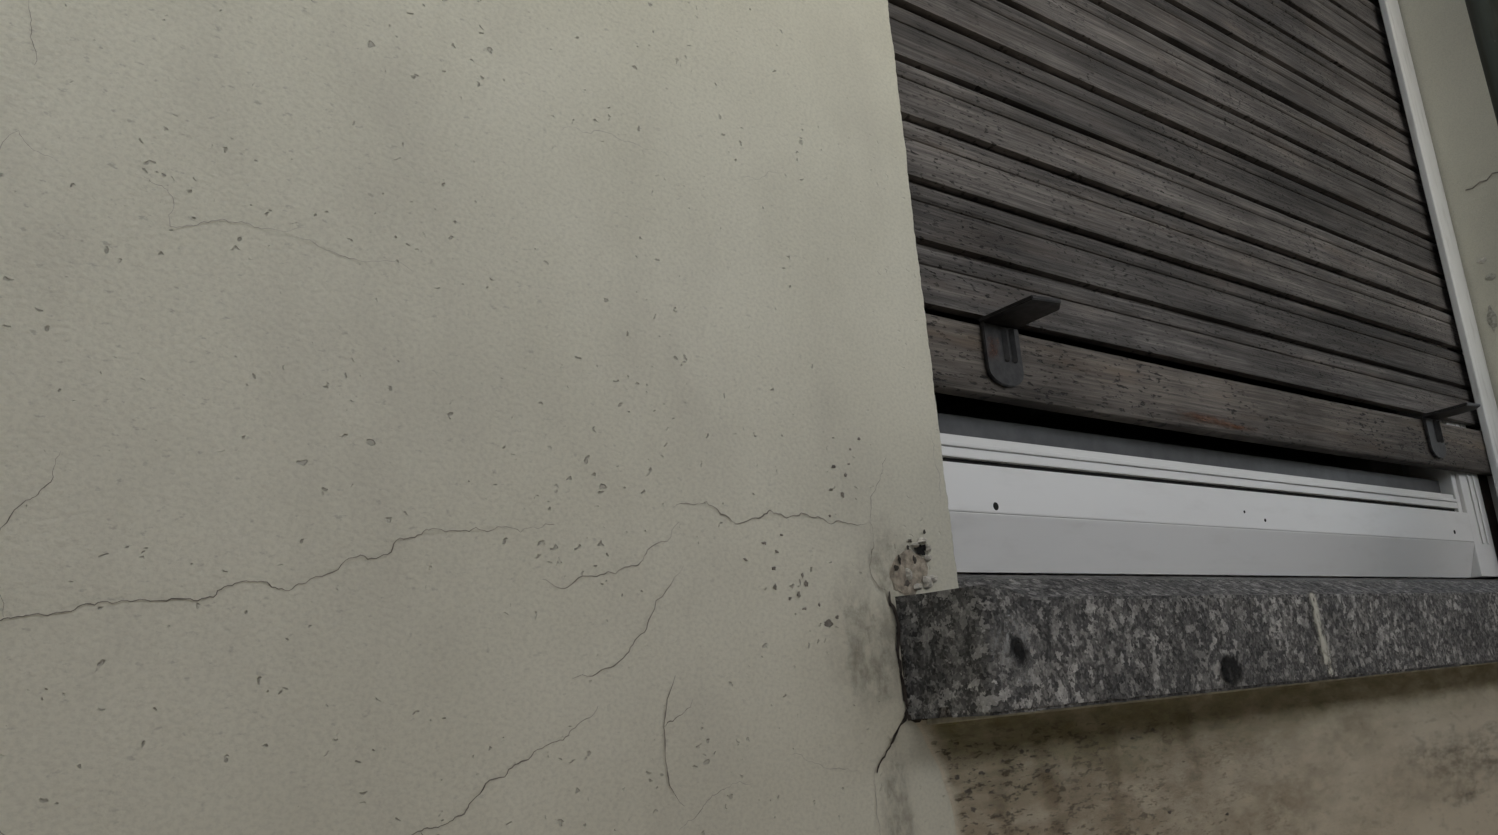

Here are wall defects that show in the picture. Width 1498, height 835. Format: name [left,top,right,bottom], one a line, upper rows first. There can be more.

crack [0,451,61,530]
crack [0,524,554,621]
flaking render [890,529,938,595]
crack [412,460,927,835]
water stain [942,742,1096,835]